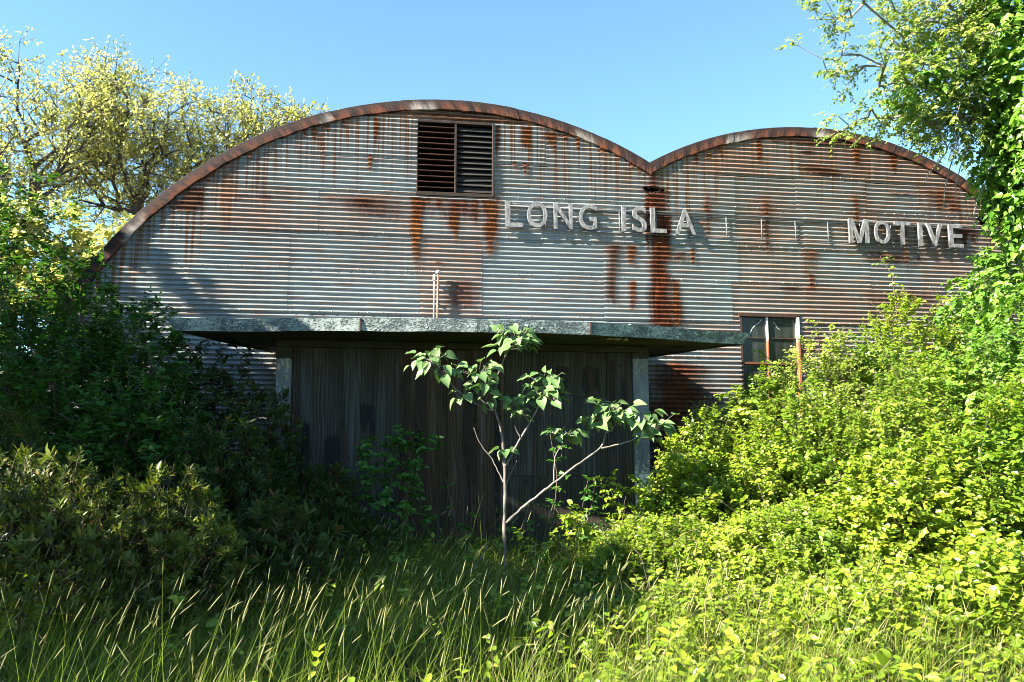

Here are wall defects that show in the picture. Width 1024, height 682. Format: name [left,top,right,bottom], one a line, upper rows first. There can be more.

corrosion [303,119,346,141]
corrosion [545,131,580,153]
corrosion [774,138,866,176]
corrosion [169,171,215,212]
corrosion [335,196,387,215]
corrosion [410,197,497,261]
corrosion [607,164,695,327]
corrosion [955,226,976,245]
corrosion [648,363,713,488]